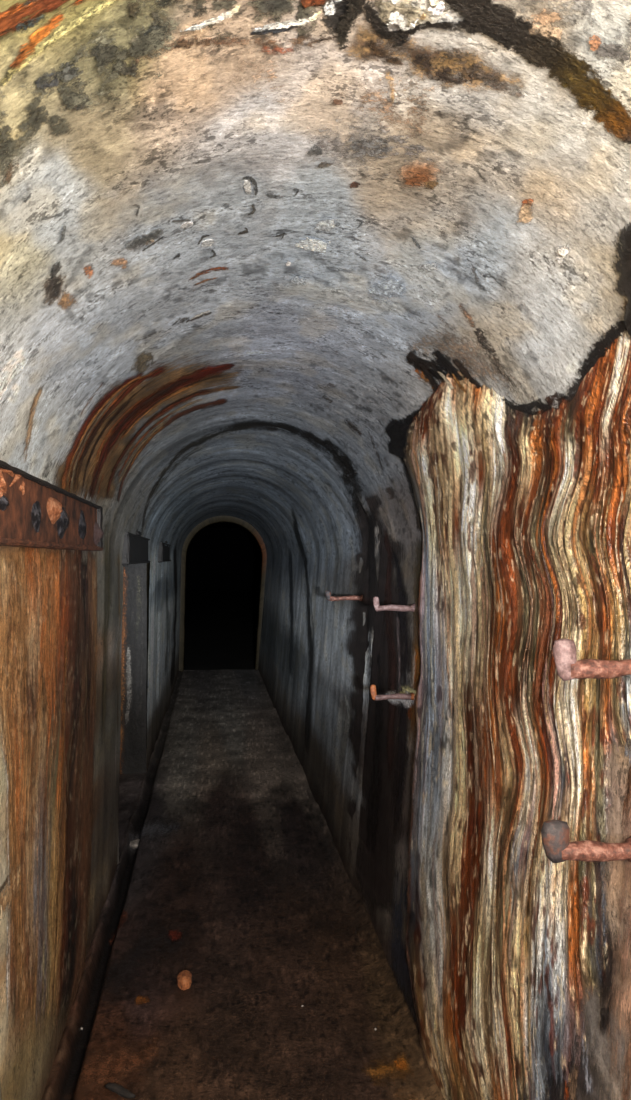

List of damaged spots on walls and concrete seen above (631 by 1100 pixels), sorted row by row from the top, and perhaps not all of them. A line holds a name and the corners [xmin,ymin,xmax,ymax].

rust [0,0,85,70]
spalling [371,0,450,30]
leakage [513,0,597,45]
leakage [0,0,524,187]
leakage [502,222,631,416]
leakage [406,350,481,393]
leakage [474,328,514,387]
rust [24,389,42,460]
rust [55,352,241,503]
rust [0,468,25,498]
rust [403,305,631,1100]
rust [0,547,98,1060]